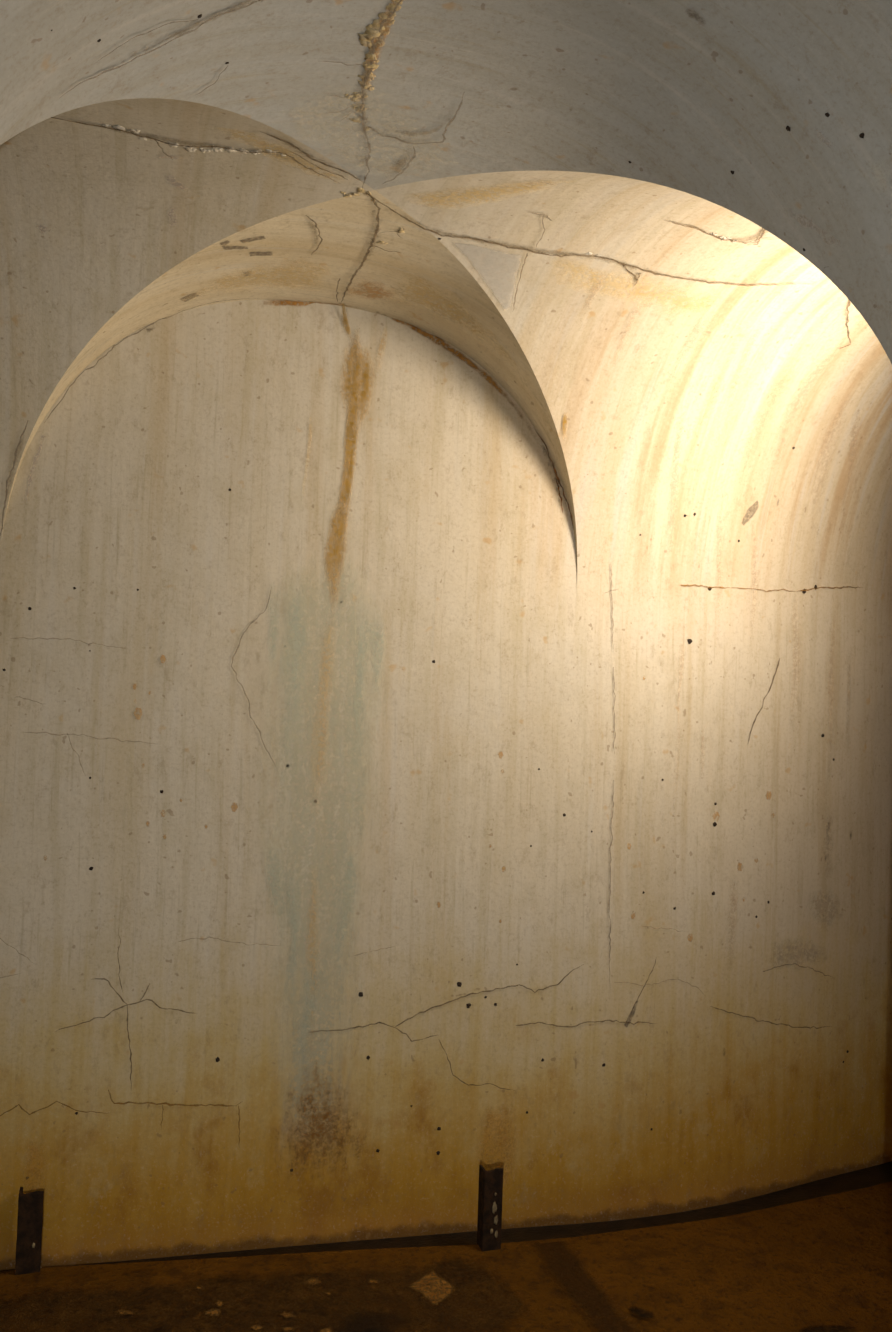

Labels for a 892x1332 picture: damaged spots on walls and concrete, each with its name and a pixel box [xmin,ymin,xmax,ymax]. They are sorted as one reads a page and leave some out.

efflorescence [344,0,404,131]
crack [51,0,793,303]
corrosion [392,318,522,417]
corrosion [272,283,388,592]
crack [681,584,863,592]
crack [312,571,656,1091]
crack [0,939,241,1142]
crack [714,1007,830,1029]
water stain [291,1091,350,1166]